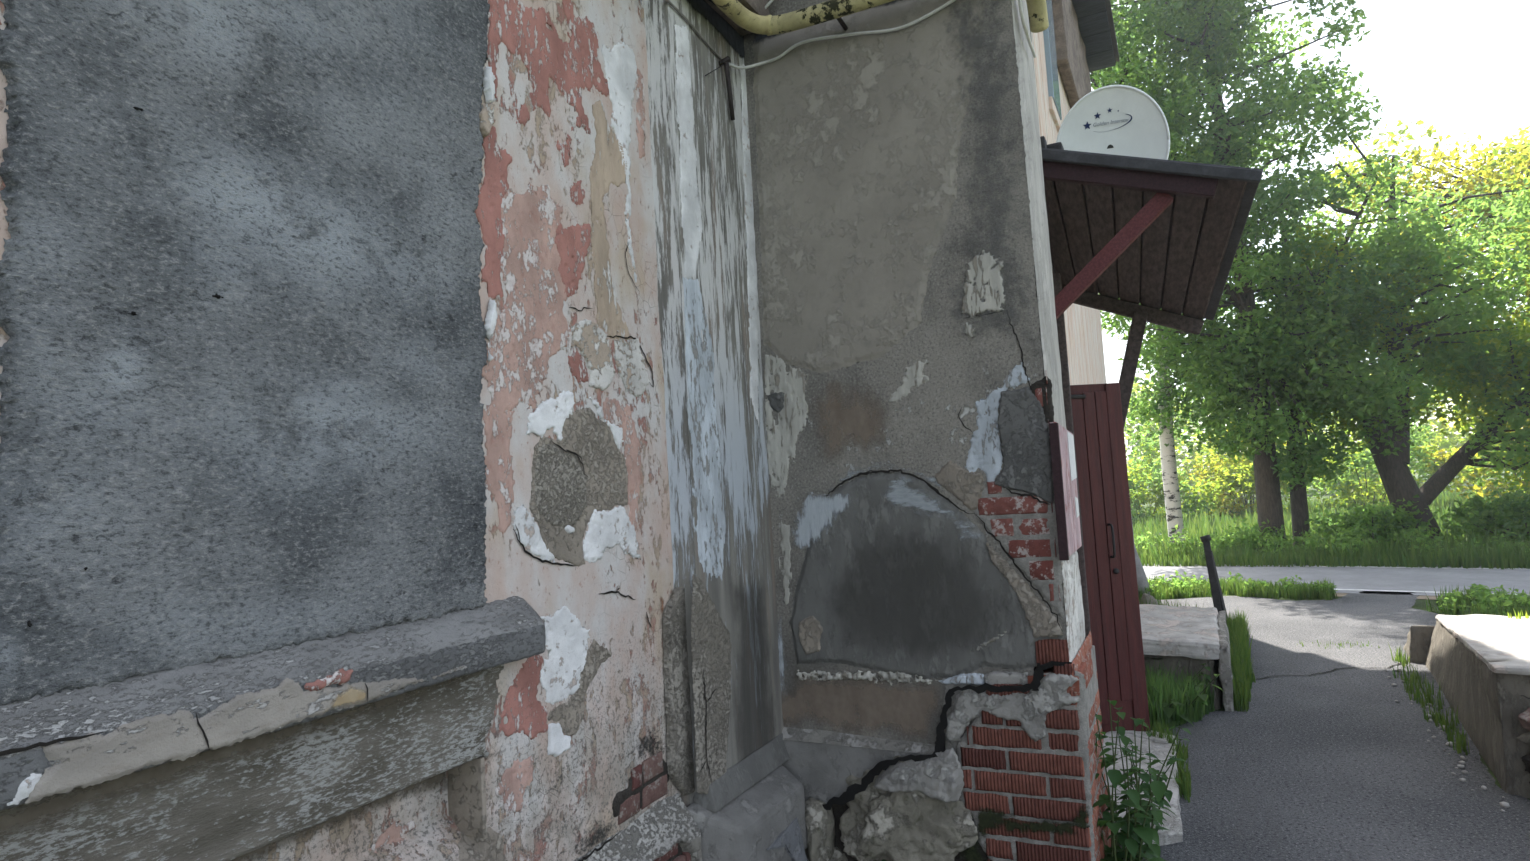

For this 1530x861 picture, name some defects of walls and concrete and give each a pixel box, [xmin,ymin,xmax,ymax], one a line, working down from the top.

damp [687,0,777,58]
peeling [474,0,650,567]
flaking render [1030,370,1054,423]
flaking render [935,460,1085,674]
crack [196,713,210,750]
spalling [7,666,468,806]
spalling [495,639,612,816]
spalling [612,574,732,825]
crack [823,469,1072,810]
spalling [458,827,508,861]
crack [578,831,620,861]
flaking render [654,843,691,861]